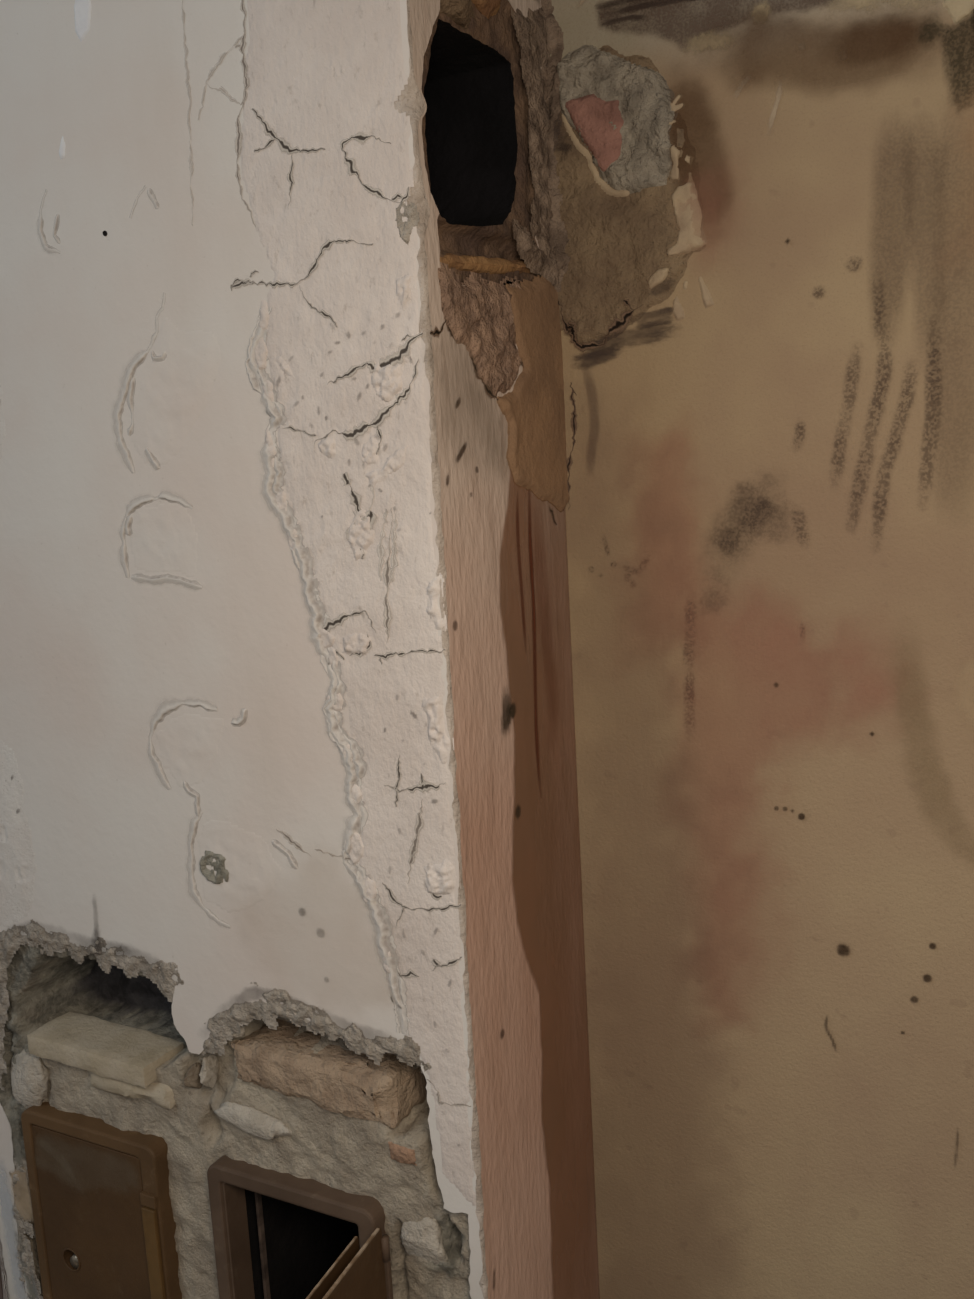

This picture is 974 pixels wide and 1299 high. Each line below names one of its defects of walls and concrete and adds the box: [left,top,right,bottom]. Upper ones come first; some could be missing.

crack [182,0,409,227]
crack [230,239,372,327]
spalling [438,0,630,400]
peeling [667,94,683,125]
peeling [648,145,707,289]
damp [673,95,723,210]
damp [921,17,974,103]
crack [282,320,498,665]
flaking render [0,0,476,1299]
crack [277,830,351,860]
crack [382,756,461,929]